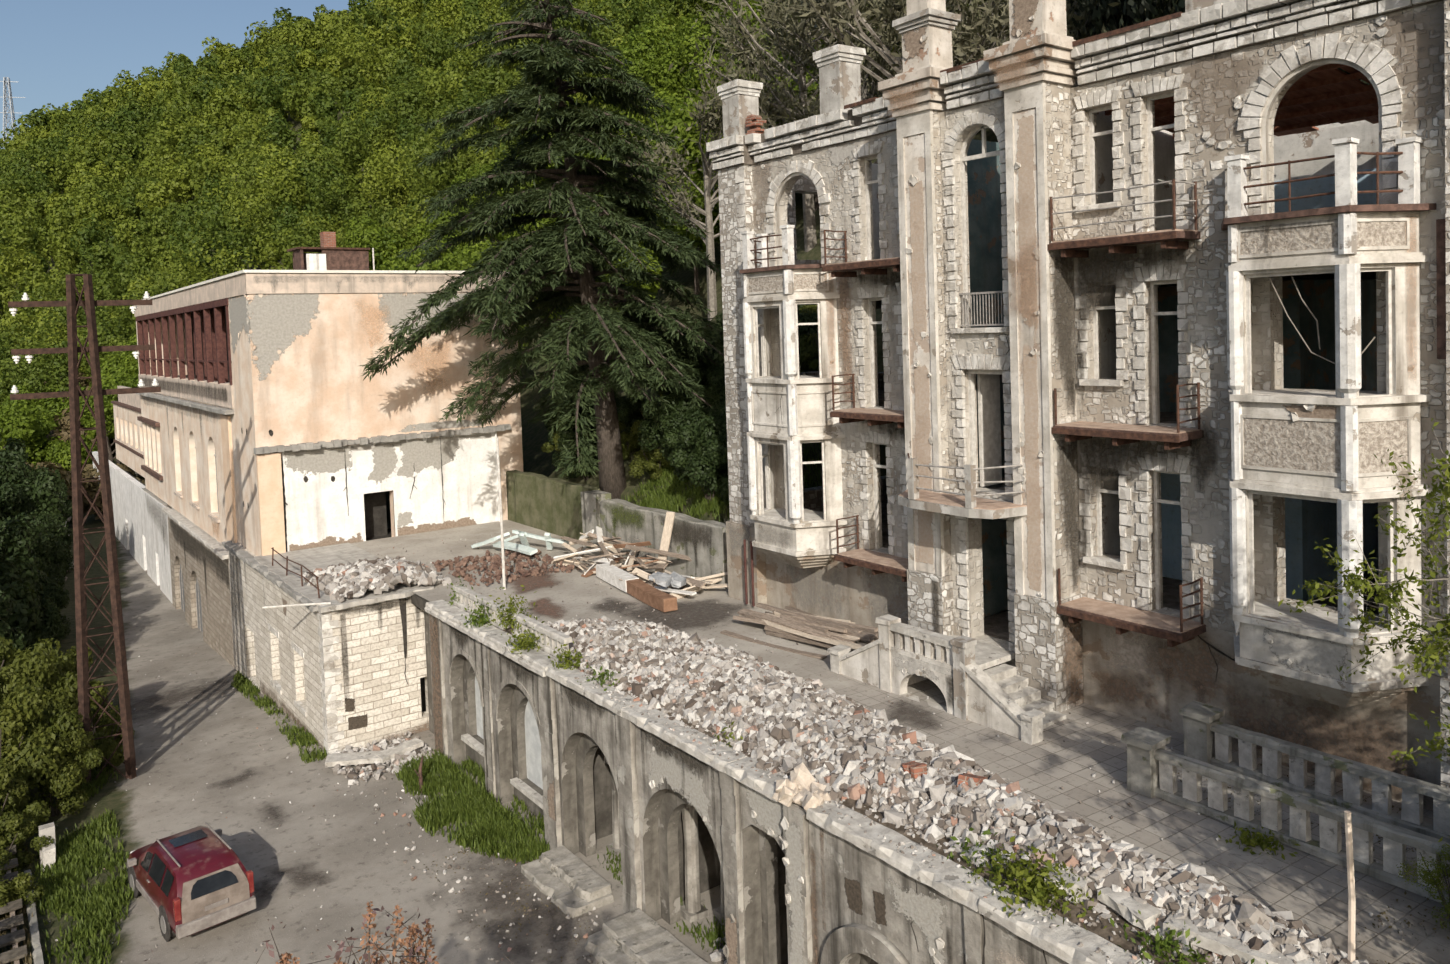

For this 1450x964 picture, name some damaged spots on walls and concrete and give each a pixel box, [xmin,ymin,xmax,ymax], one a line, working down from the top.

peeling [228,293,320,381]
flaking render [284,419,492,485]
spalling [289,533,363,551]
spalling [397,512,476,536]
leakage [1064,617,1084,705]
leakage [1102,634,1221,704]
leakage [1231,694,1417,800]
flaking render [844,877,947,964]